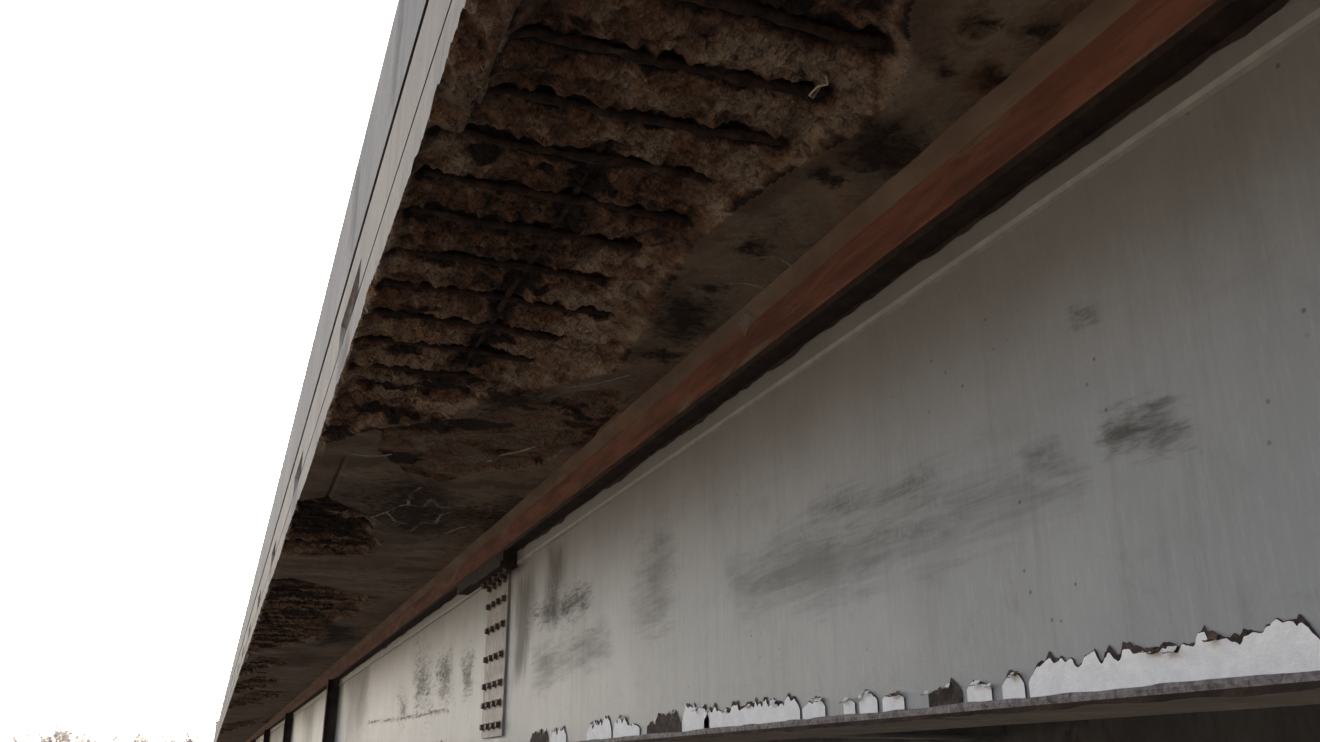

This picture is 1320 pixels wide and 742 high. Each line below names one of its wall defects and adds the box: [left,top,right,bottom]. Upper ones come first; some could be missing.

spalling [319,0,916,481]
spalling [281,495,386,555]
crack [369,487,474,553]
spalling [219,578,377,734]
peeling [921,614,1320,708]